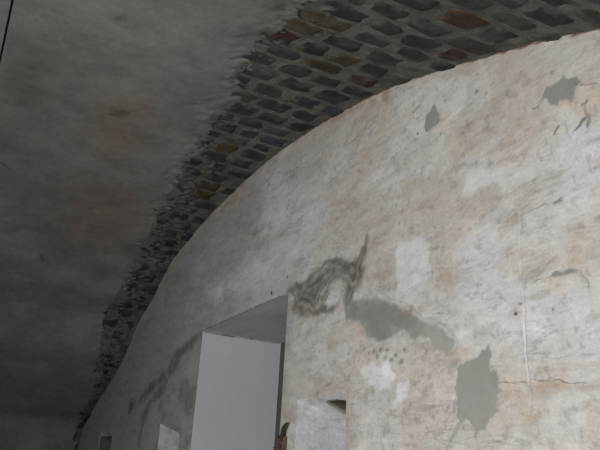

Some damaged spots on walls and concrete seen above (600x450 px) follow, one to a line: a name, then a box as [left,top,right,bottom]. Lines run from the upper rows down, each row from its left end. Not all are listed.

flaking render [154,0,600,241]
crack [496,195,563,225]
flaking render [79,211,189,420]
water stain [284,226,421,348]
crack [534,265,590,289]
peeling [435,342,503,450]
crack [497,377,600,385]